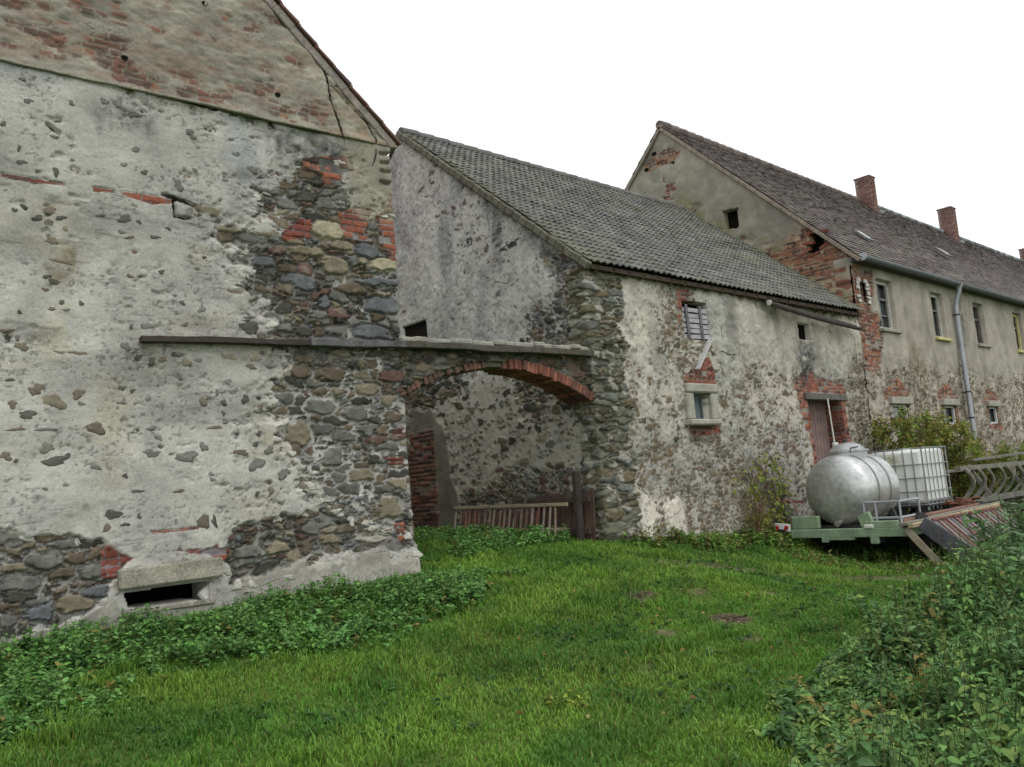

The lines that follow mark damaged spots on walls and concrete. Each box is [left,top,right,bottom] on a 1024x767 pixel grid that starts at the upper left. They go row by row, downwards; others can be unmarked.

crack [324,71,377,164]
flaking render [644,142,675,172]
flaking render [95,207,142,239]
flaking render [775,228,844,289]
flaking render [527,254,582,345]
flaking render [149,157,470,590]
flaking render [515,378,549,413]
flaking render [86,422,106,435]
flaking render [135,426,163,457]
flaking render [0,509,141,641]